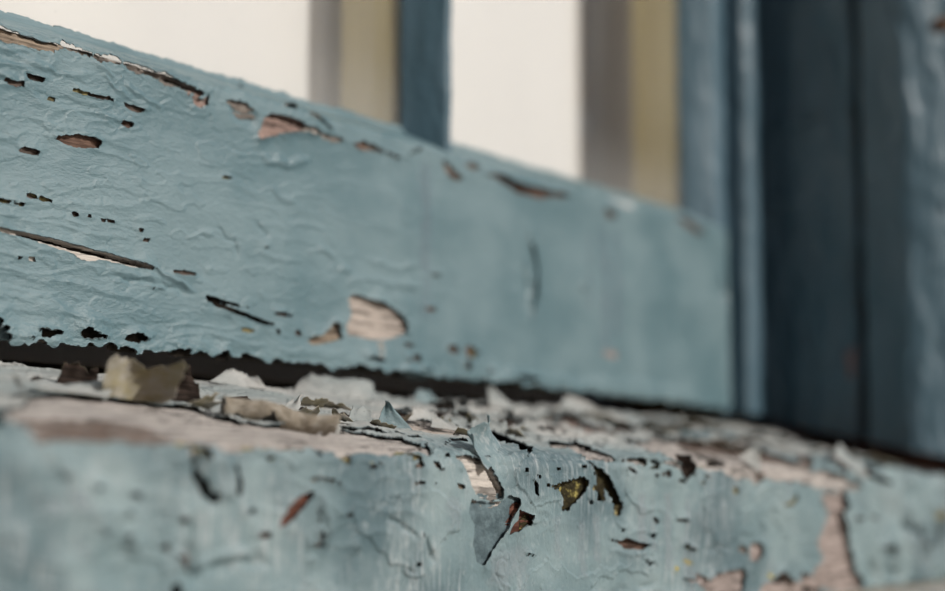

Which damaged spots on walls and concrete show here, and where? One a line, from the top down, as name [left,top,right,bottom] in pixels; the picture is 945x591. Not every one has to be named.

peeling [0,22,578,207]
peeling [0,182,218,298]
peeling [0,284,905,591]